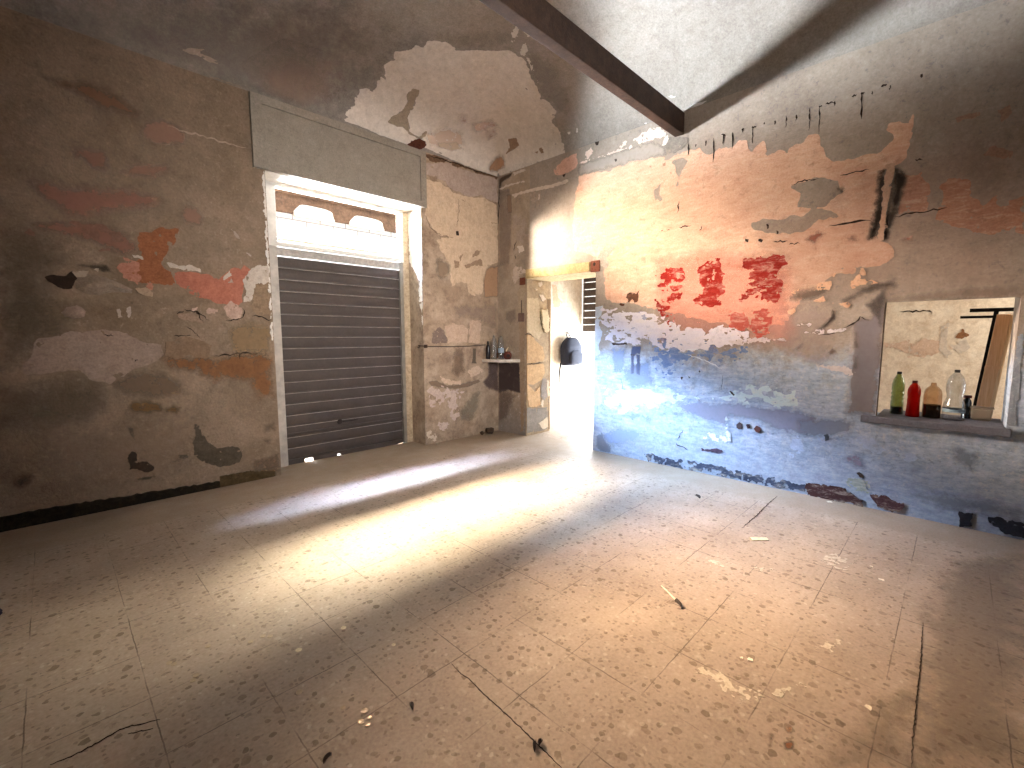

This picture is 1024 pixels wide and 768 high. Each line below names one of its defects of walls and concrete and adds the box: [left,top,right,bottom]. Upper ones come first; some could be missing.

peeling [117,171,273,340]
peeling [344,26,914,432]
water stain [884,169,907,238]
peeling [898,172,1024,235]
peeling [23,329,164,384]
peeling [179,424,242,467]
peeling [646,453,683,469]
peeling [764,477,806,491]
crack [50,719,160,765]
crack [451,663,562,768]
crack [911,625,924,767]